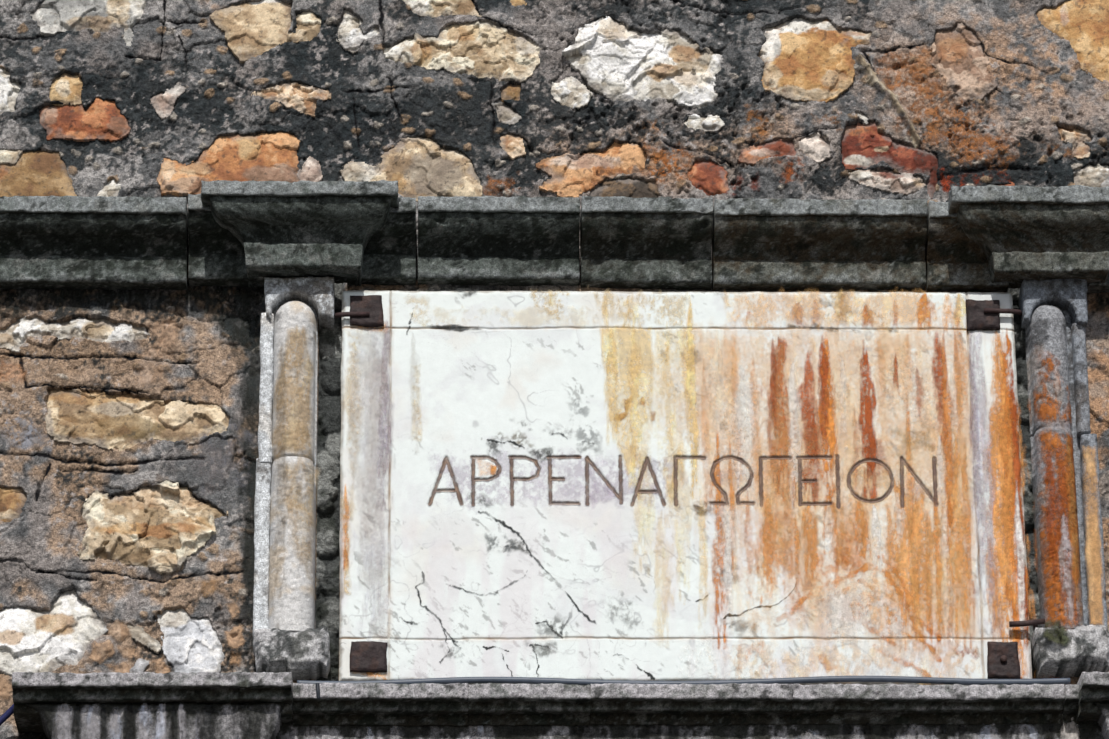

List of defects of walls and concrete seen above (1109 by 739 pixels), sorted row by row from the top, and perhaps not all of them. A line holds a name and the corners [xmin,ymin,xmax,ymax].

corrosion [918,294,930,326]
crack [0,353,194,403]
spalling [137,317,178,387]
crack [0,453,205,503]
corrosion [757,338,974,677]
corrosion [986,334,1103,679]
crack [0,558,243,583]
corrosion [712,434,735,647]
peeling [89,620,138,673]
peeling [152,658,170,674]
peeling [225,603,244,664]
crack [403,571,595,676]